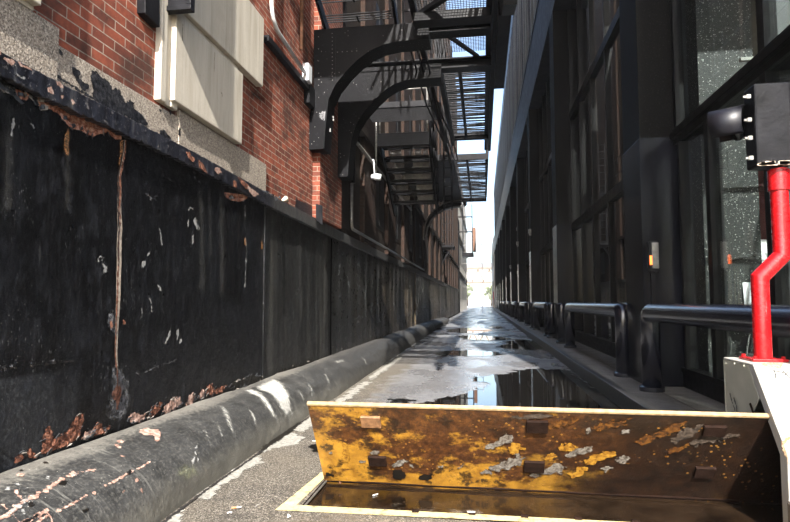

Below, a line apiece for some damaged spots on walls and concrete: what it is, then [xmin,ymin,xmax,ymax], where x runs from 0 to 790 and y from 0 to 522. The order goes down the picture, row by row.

spalling [0,81,122,140]
peeling [14,413,110,477]
peeling [485,435,514,449]
peeling [480,453,526,475]
peeling [530,446,593,478]
peeling [600,455,631,473]